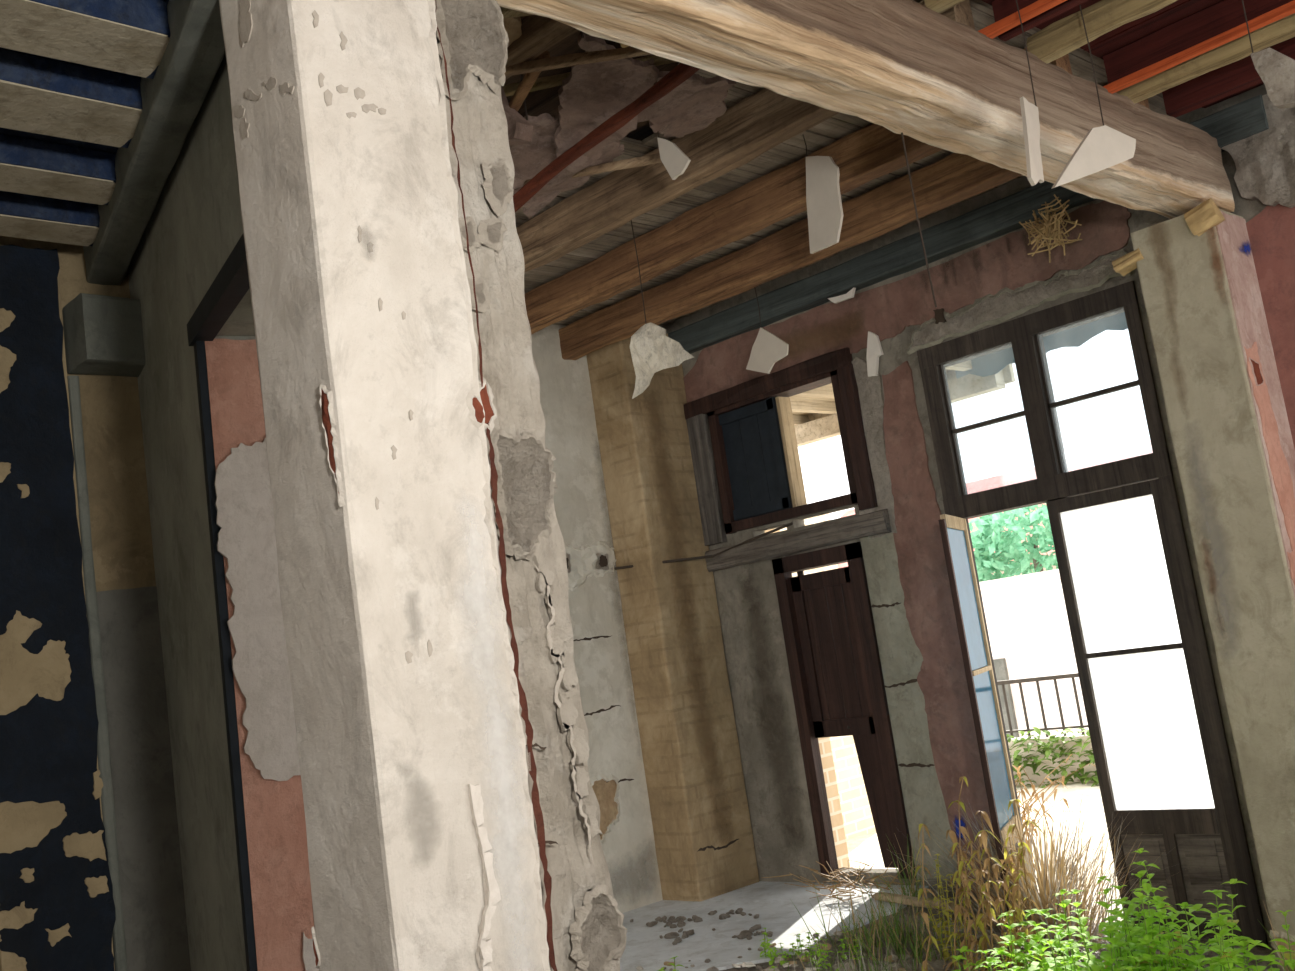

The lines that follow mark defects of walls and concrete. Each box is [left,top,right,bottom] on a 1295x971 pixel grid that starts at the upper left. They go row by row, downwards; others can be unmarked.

flaking render [434,0,509,100]
peeling [0,245,116,971]
flaking render [466,377,621,859]
crack [573,634,611,642]
crack [584,705,620,716]
flaking render [569,884,628,971]